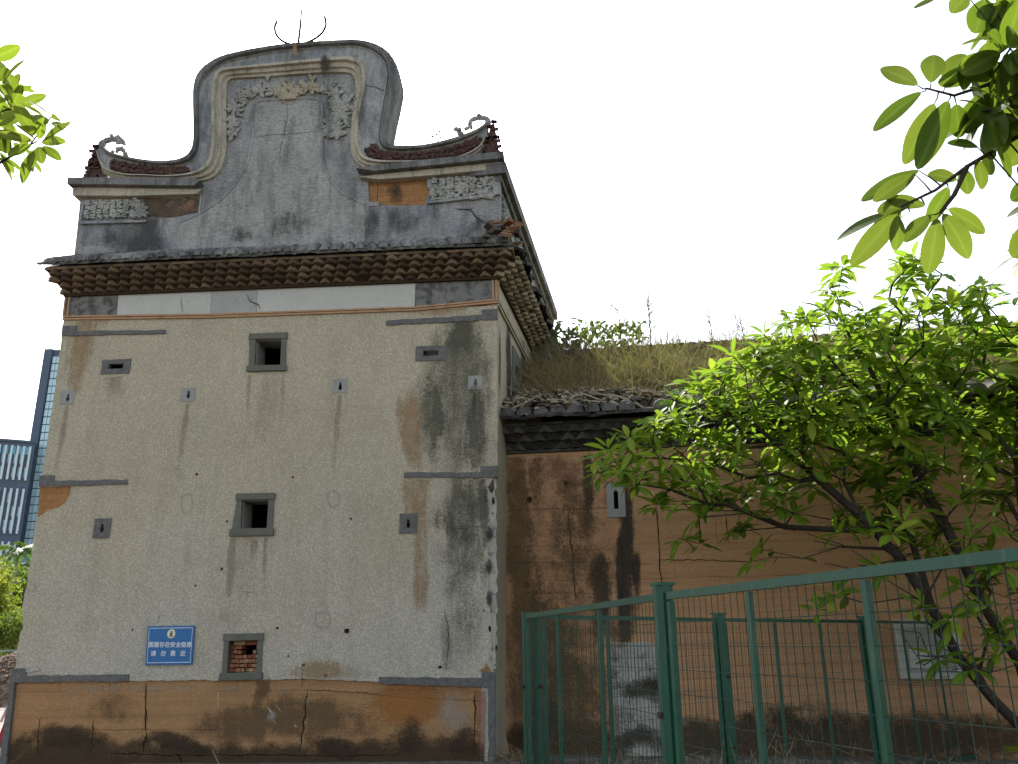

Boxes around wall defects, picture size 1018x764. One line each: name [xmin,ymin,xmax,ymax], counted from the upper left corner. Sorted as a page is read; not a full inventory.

spalling [369,180,429,207]
water stain [422,388,444,457]
water stain [465,388,484,465]
spalling [37,486,71,518]
water stain [461,479,493,547]
water stain [506,455,662,755]
water stain [0,681,485,764]
crack [89,668,405,763]
water stain [735,704,874,758]
water stain [889,713,1018,759]